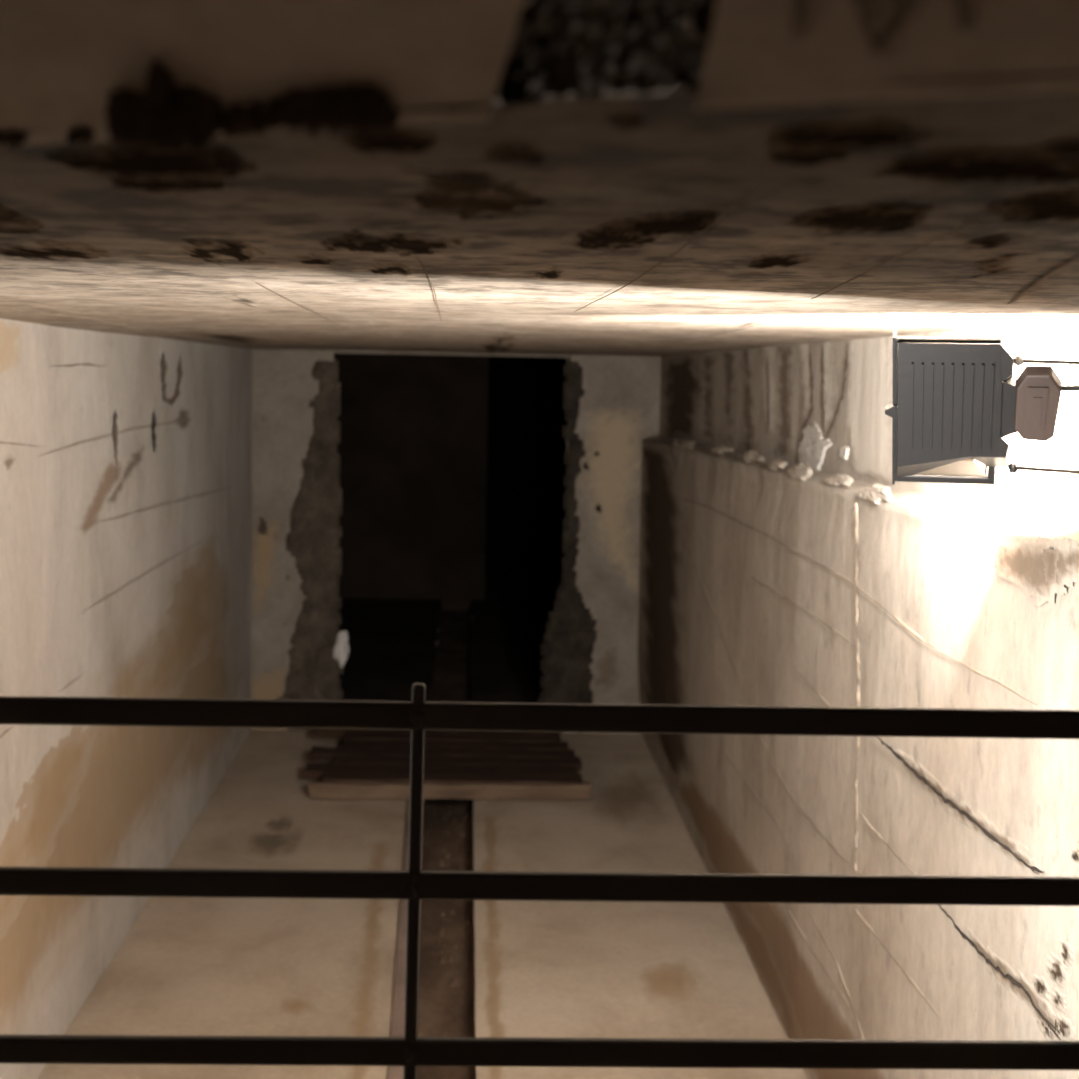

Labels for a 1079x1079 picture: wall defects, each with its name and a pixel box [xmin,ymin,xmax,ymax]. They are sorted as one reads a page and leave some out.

leakage [366,264,411,276]
leakage [535,267,564,279]
leakage [747,253,816,269]
leakage [958,233,1027,278]
peeling [276,360,343,700]
peeling [538,356,600,704]
leakage [61,509,290,700]
leakage [0,725,287,868]
crack [876,736,1044,876]
leakage [0,895,122,1035]
crack [939,905,1062,1040]
leakage [0,1063,33,1079]